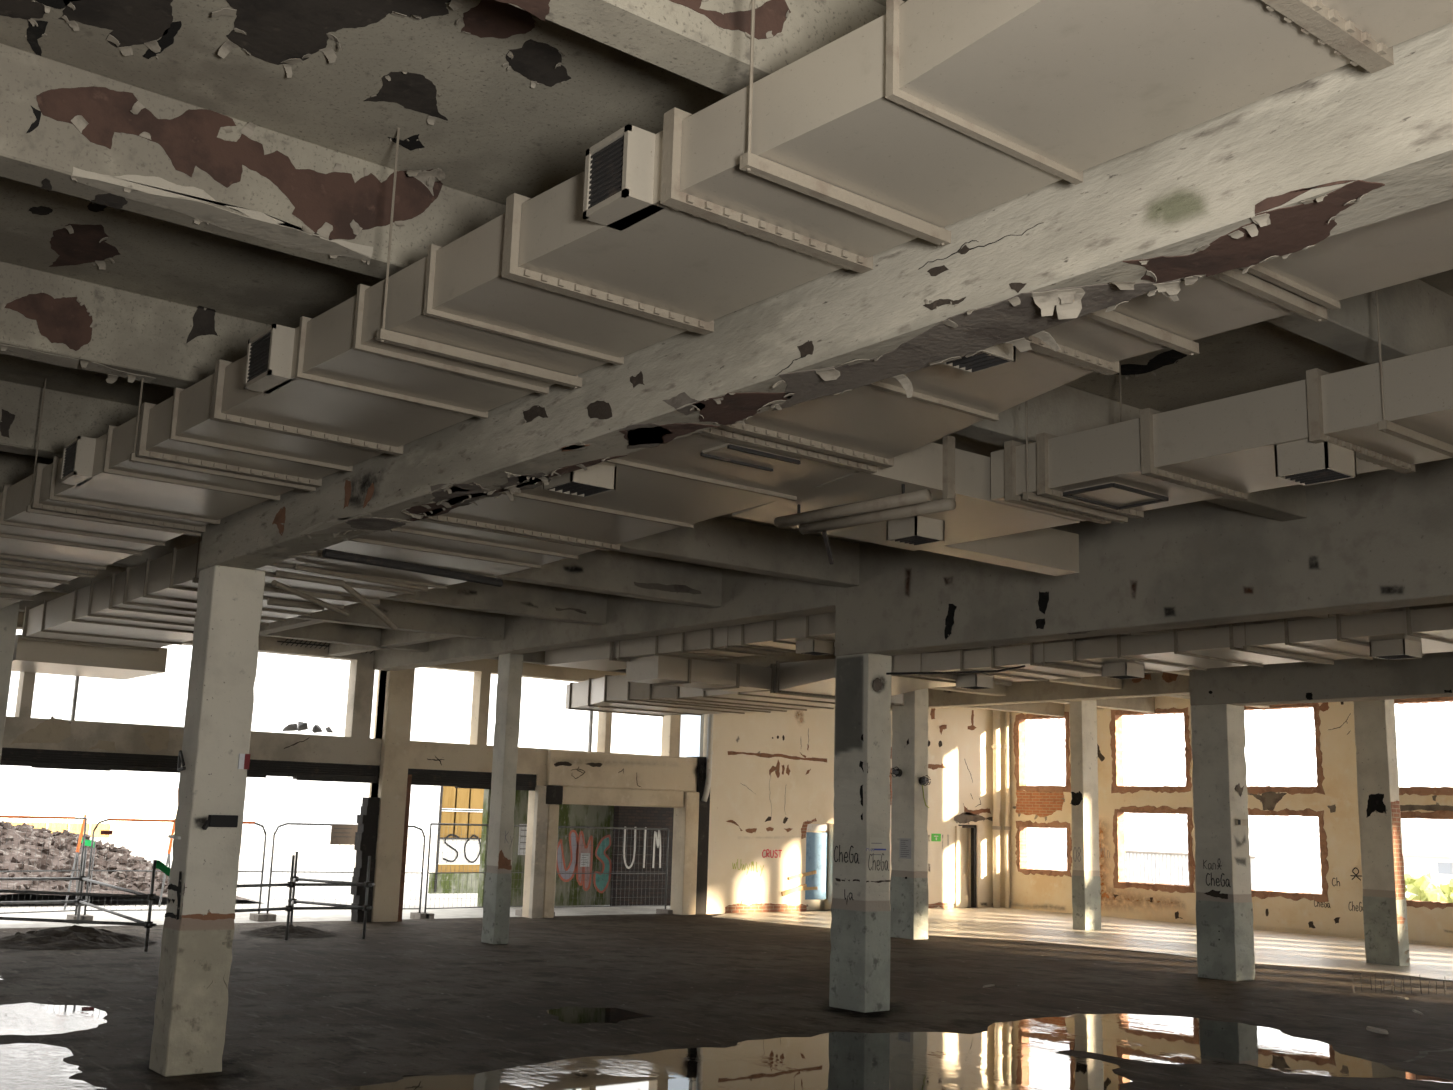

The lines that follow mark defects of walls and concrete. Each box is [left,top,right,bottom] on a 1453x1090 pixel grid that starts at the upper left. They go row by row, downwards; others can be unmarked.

peeling [669,0,791,40]
peeling [364,71,448,125]
peeling [29,86,446,269]
peeling [0,290,156,384]
spalling [272,180,1385,539]
spalling [944,604,957,639]
flaking render [1394,690,1453,704]
flaking render [1013,711,1083,877]
flaking render [1366,786,1453,963]